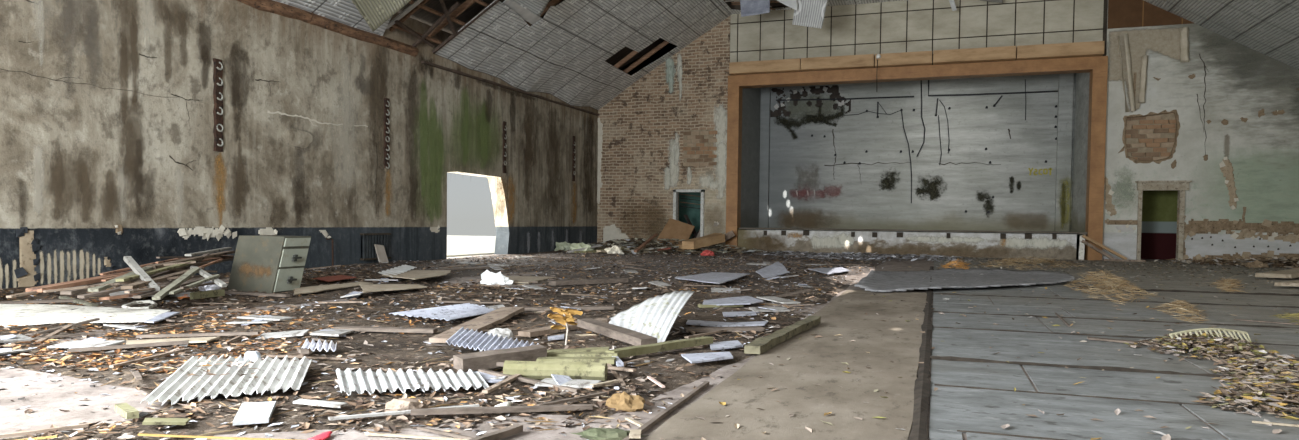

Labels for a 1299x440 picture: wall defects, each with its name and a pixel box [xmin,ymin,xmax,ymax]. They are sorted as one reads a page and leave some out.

crack [1,41,202,126]
water stain [50,0,153,220]
water stain [158,0,211,87]
rust [216,157,226,224]
water stain [231,45,248,218]
water stain [271,180,307,225]
crack [255,79,378,212]
water stain [369,48,387,211]
water stain [409,58,442,220]
spalling [935,155,1299,289]
peeling [1109,27,1195,169]